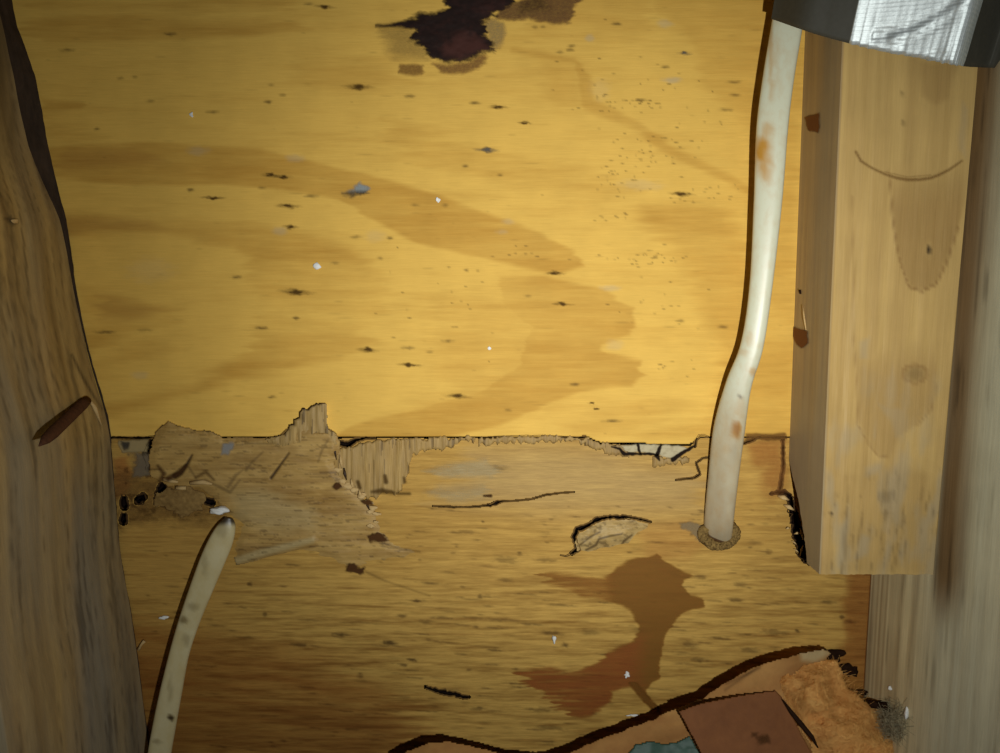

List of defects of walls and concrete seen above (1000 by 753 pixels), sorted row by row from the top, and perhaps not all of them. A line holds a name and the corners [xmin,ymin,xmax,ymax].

leakage [380,0,581,74]
leakage [345,184,369,196]
crack [112,435,155,470]
crack [340,436,376,448]
spalling [334,435,475,528]
crack [433,491,574,509]
crack [480,433,586,441]
crack [676,434,710,481]
crack [743,434,791,497]
leakage [593,556,704,709]